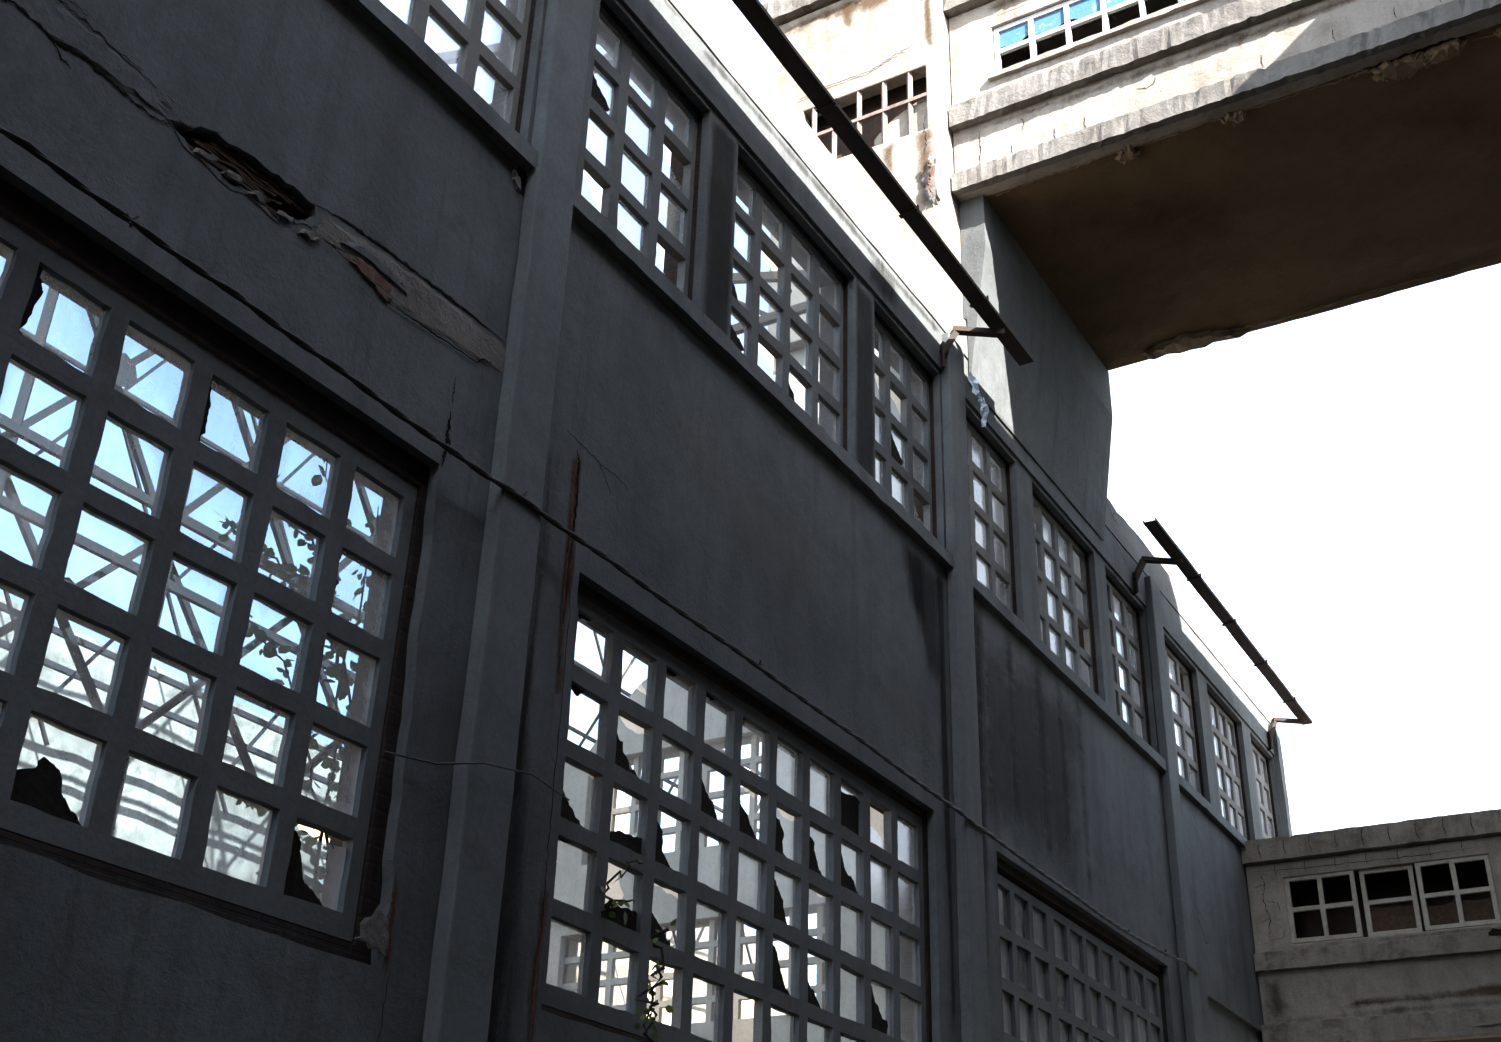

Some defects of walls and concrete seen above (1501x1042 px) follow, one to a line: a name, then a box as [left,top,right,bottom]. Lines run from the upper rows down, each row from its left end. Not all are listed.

crack [4,0,176,127]
peeling [1308,27,1501,90]
peeling [1123,266,1475,363]
corrosion [557,452,580,690]